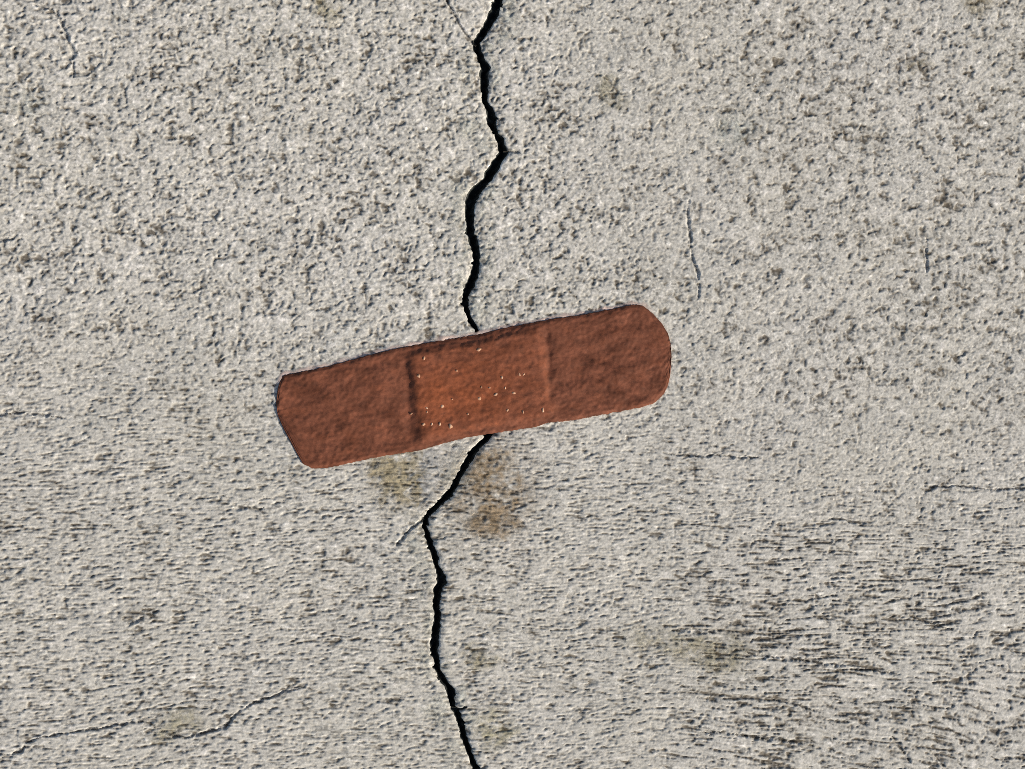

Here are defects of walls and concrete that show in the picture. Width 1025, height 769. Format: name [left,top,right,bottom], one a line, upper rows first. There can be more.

crack [446,0,515,333]
crack [406,433,494,769]